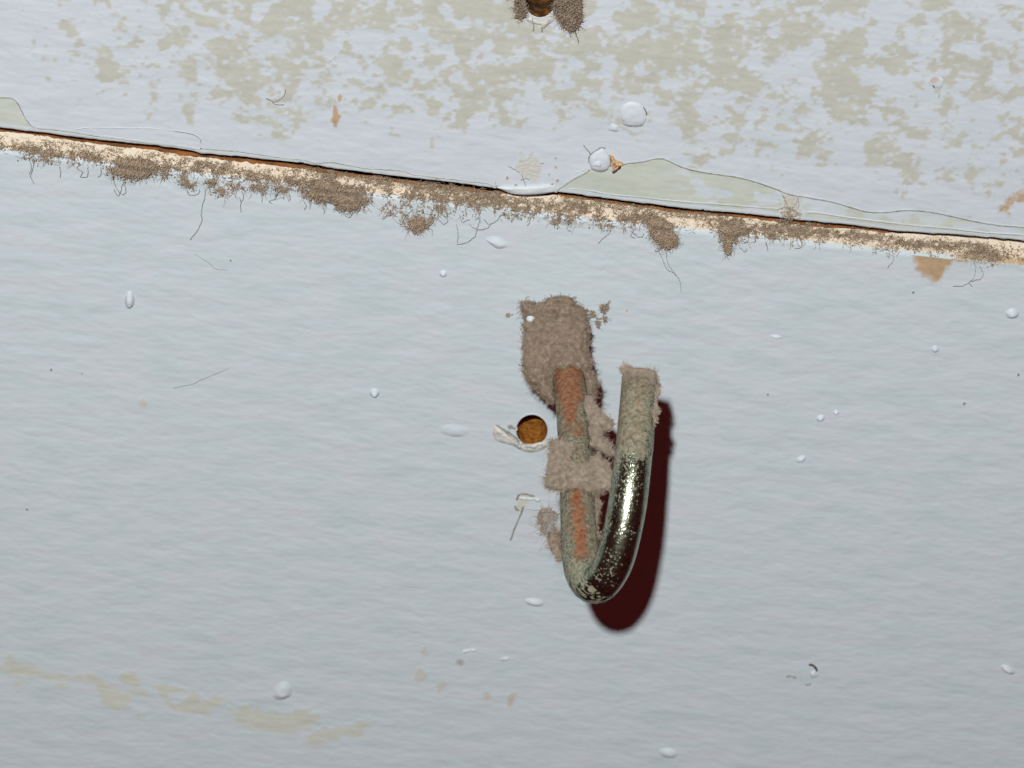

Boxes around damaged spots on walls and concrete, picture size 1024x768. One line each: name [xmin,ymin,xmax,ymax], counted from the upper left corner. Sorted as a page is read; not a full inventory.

peeling [0,0,1024,238]
rust [552,365,588,440]
rust [567,487,591,562]